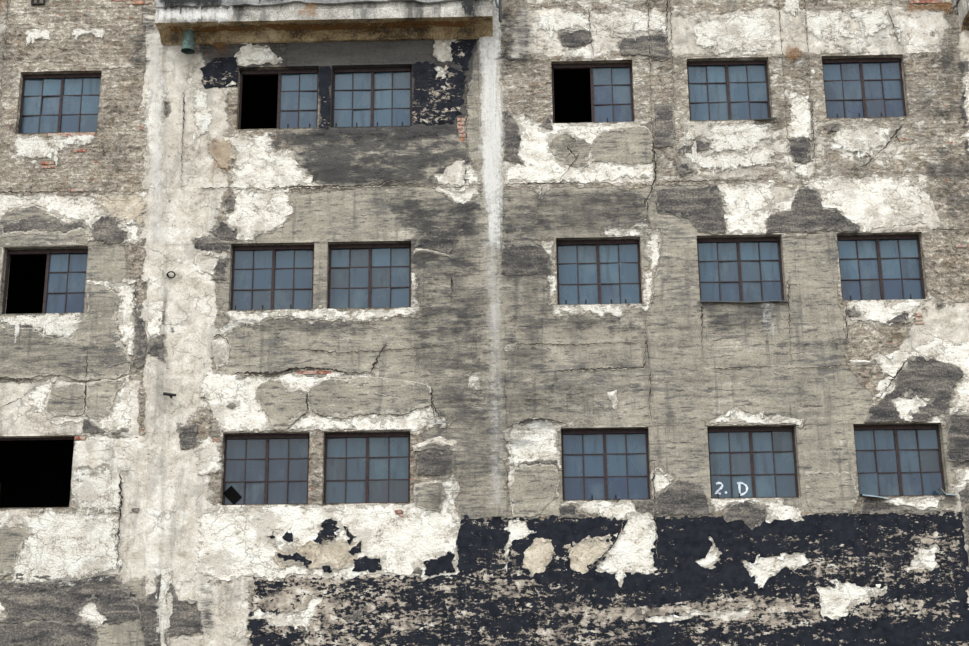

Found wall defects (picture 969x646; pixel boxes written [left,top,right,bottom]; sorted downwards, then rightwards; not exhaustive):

peeling [192,43,320,240]
damp [397,0,538,245]
crack [180,0,819,243]
peeling [501,115,654,197]
peeling [671,93,926,234]
crack [287,395,342,430]
peeling [194,370,446,476]
crack [235,342,481,377]
crack [504,311,652,426]
peeling [0,463,135,588]
crack [115,472,123,566]
peeling [195,418,969,646]